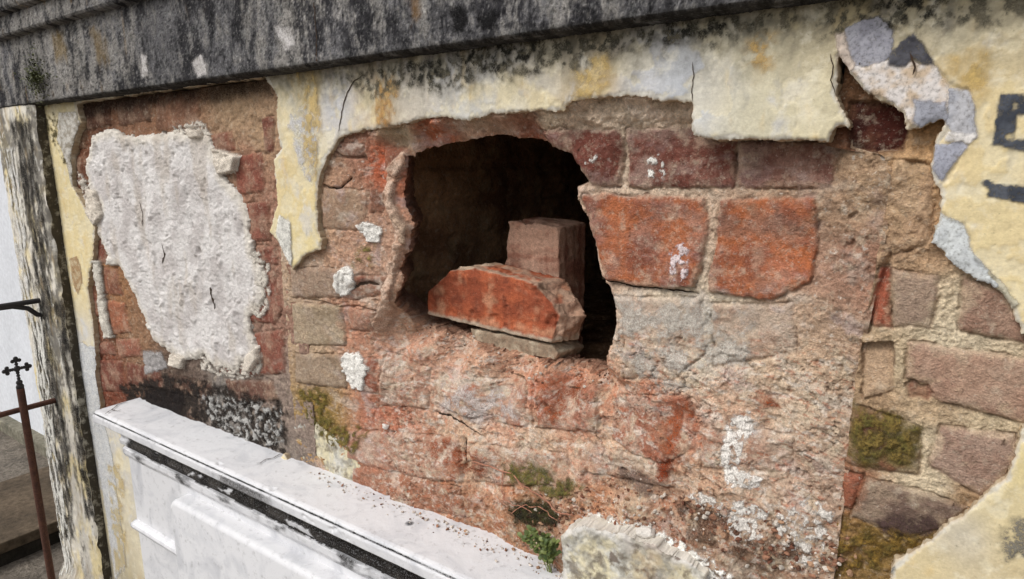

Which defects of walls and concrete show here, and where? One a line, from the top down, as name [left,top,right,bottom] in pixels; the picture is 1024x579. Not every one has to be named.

mould [347,5,799,99]
spalling [69,257,82,294]
spalling [76,80,328,471]
spalling [281,16,1024,579]
water stain [119,351,288,454]